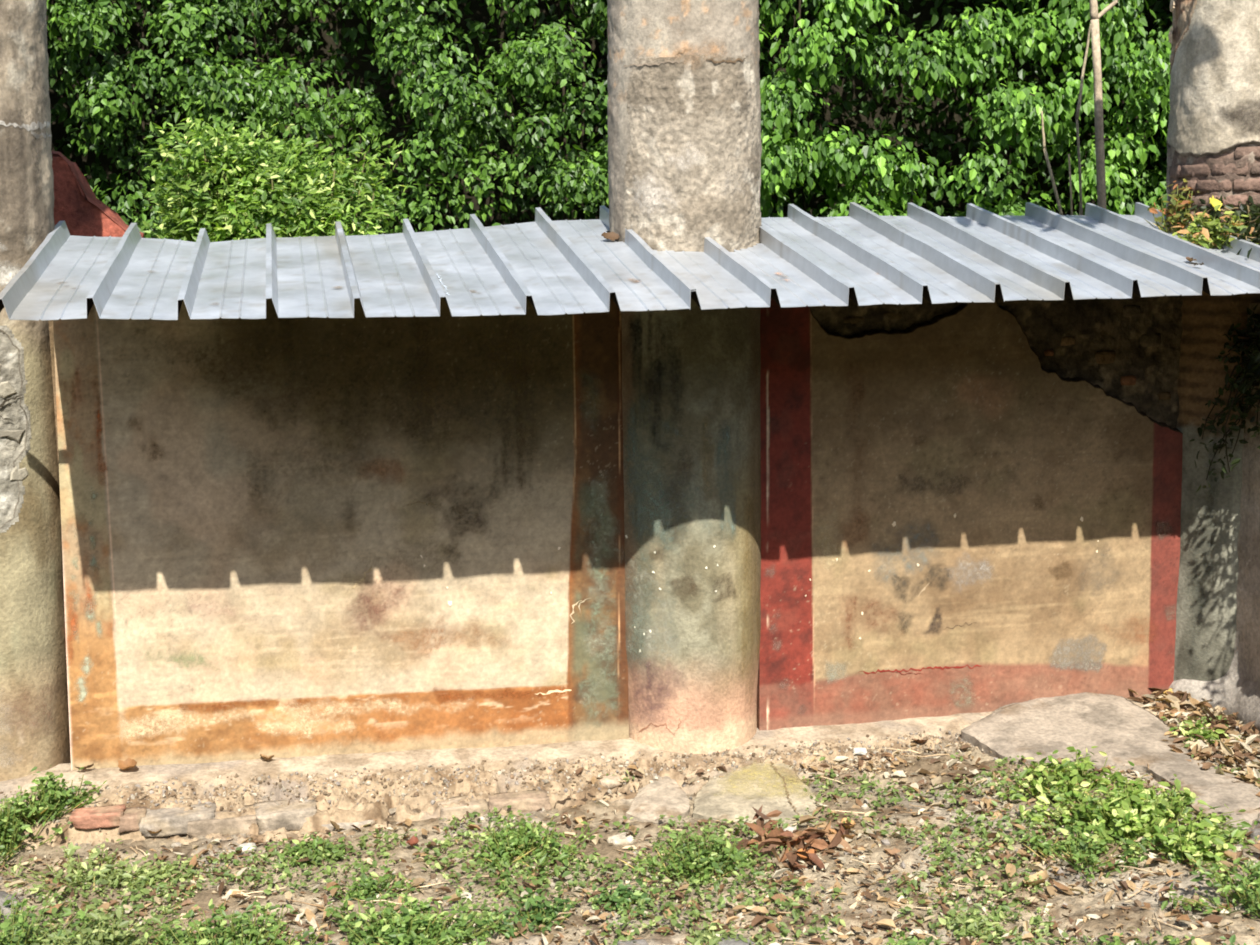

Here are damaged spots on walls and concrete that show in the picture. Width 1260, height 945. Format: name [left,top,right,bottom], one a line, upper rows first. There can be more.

spalling [0,325,32,533]
spalling [995,292,1183,434]